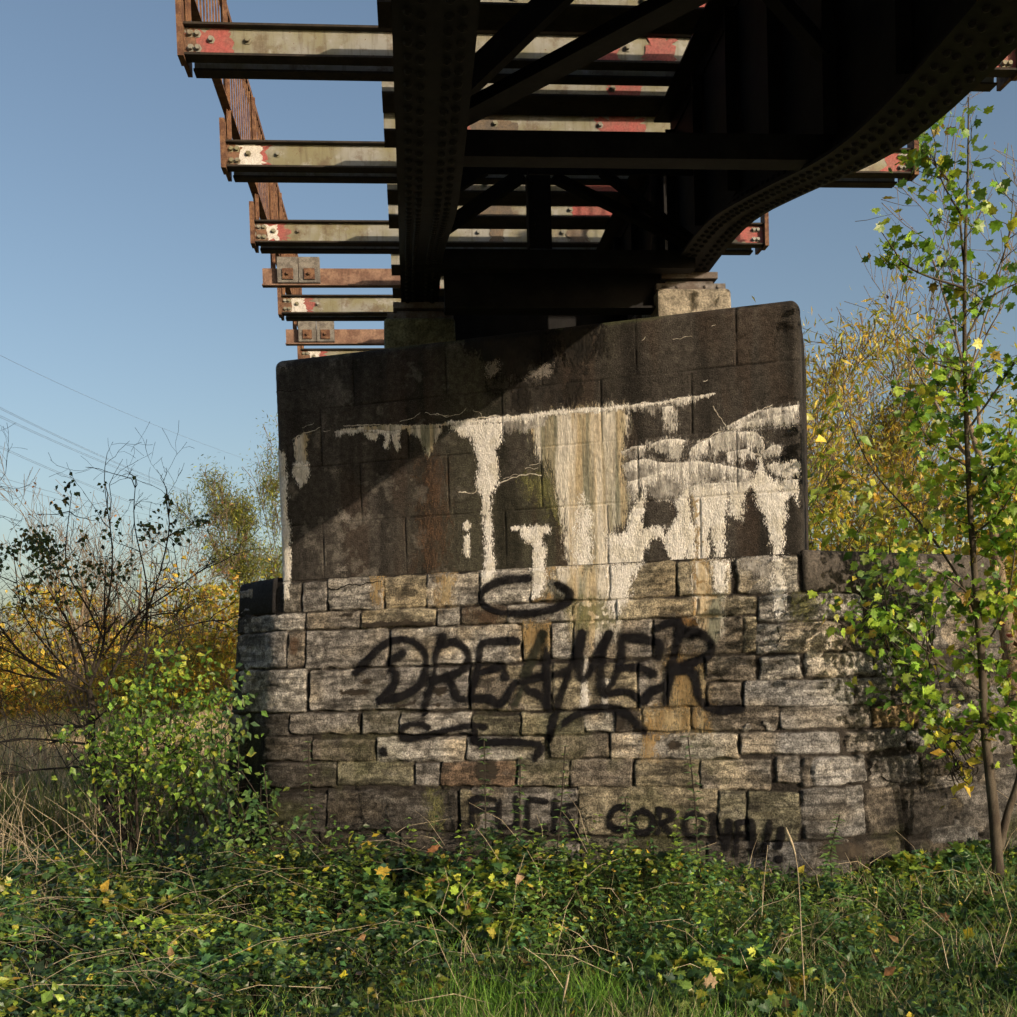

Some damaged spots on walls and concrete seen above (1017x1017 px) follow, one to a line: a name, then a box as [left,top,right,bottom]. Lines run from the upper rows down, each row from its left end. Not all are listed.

peeling [226,144,266,165]
damp [278,432,310,600]
damp [336,322,817,708]